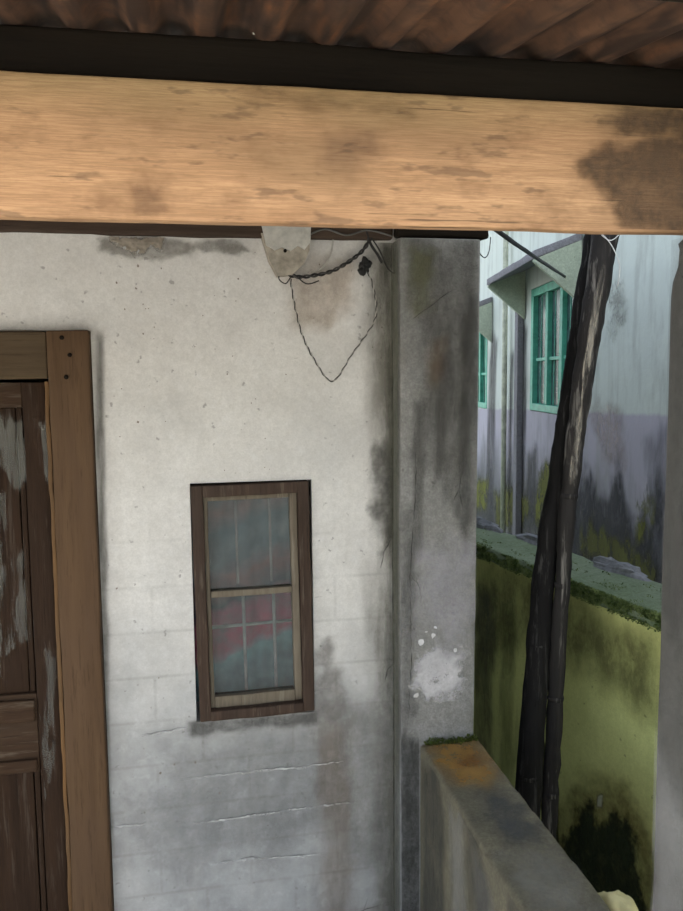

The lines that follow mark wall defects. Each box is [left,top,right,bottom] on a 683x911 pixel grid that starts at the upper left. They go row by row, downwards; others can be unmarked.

damp [580,109,683,230]
damp [373,247,394,551]
peeling [414,626,462,699]
damp [191,713,316,734]
crack [261,761,339,771]
rust [435,741,495,784]
crack [197,802,342,824]